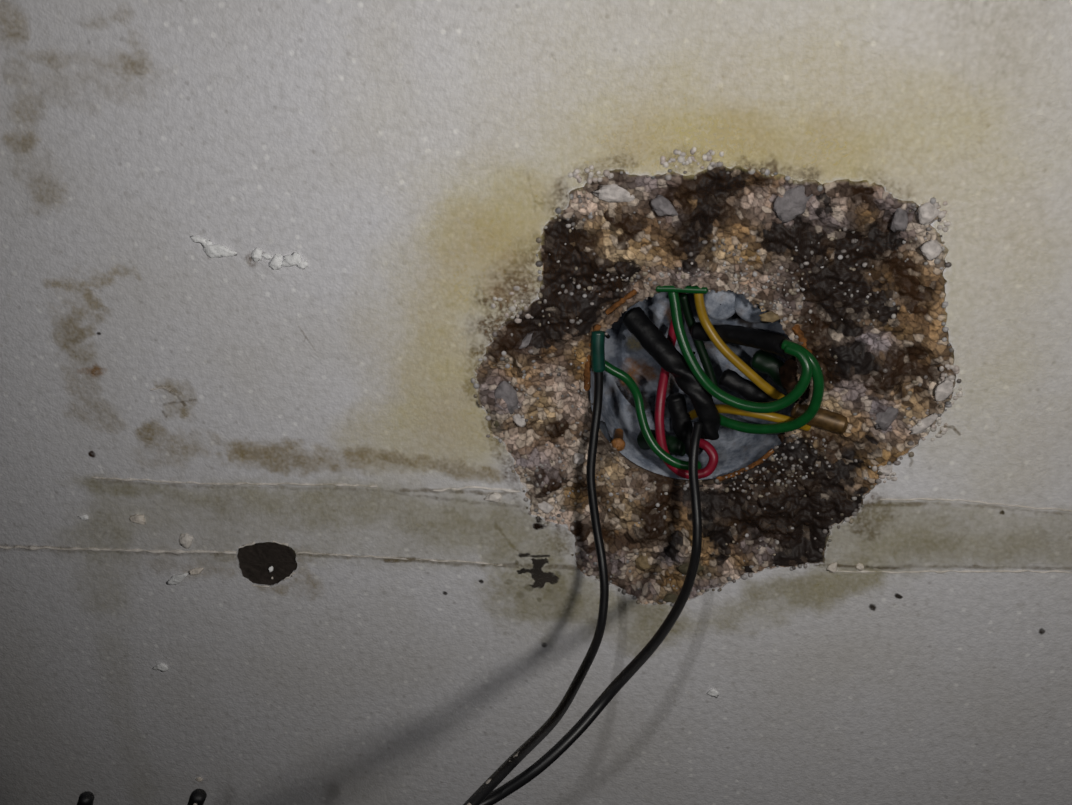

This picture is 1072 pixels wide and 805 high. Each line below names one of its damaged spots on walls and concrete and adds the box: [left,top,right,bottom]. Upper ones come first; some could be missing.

spalling [468,147,963,607]